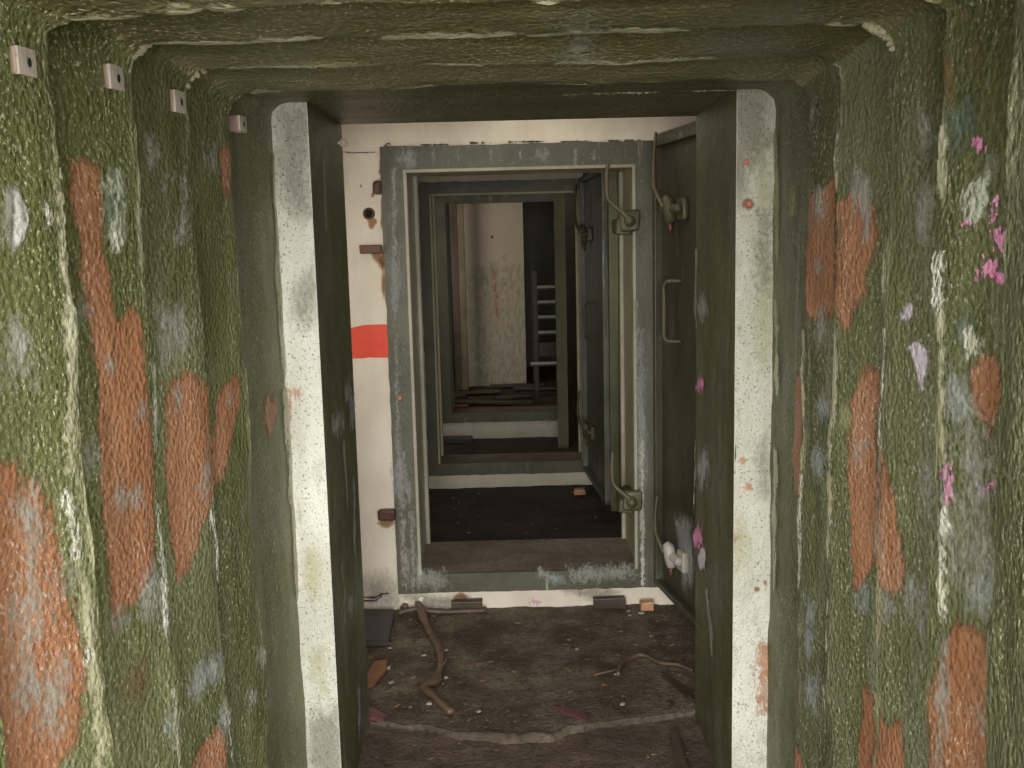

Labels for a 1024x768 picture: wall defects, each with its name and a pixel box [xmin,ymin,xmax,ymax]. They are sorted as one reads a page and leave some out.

corrosion [372,248,385,295]